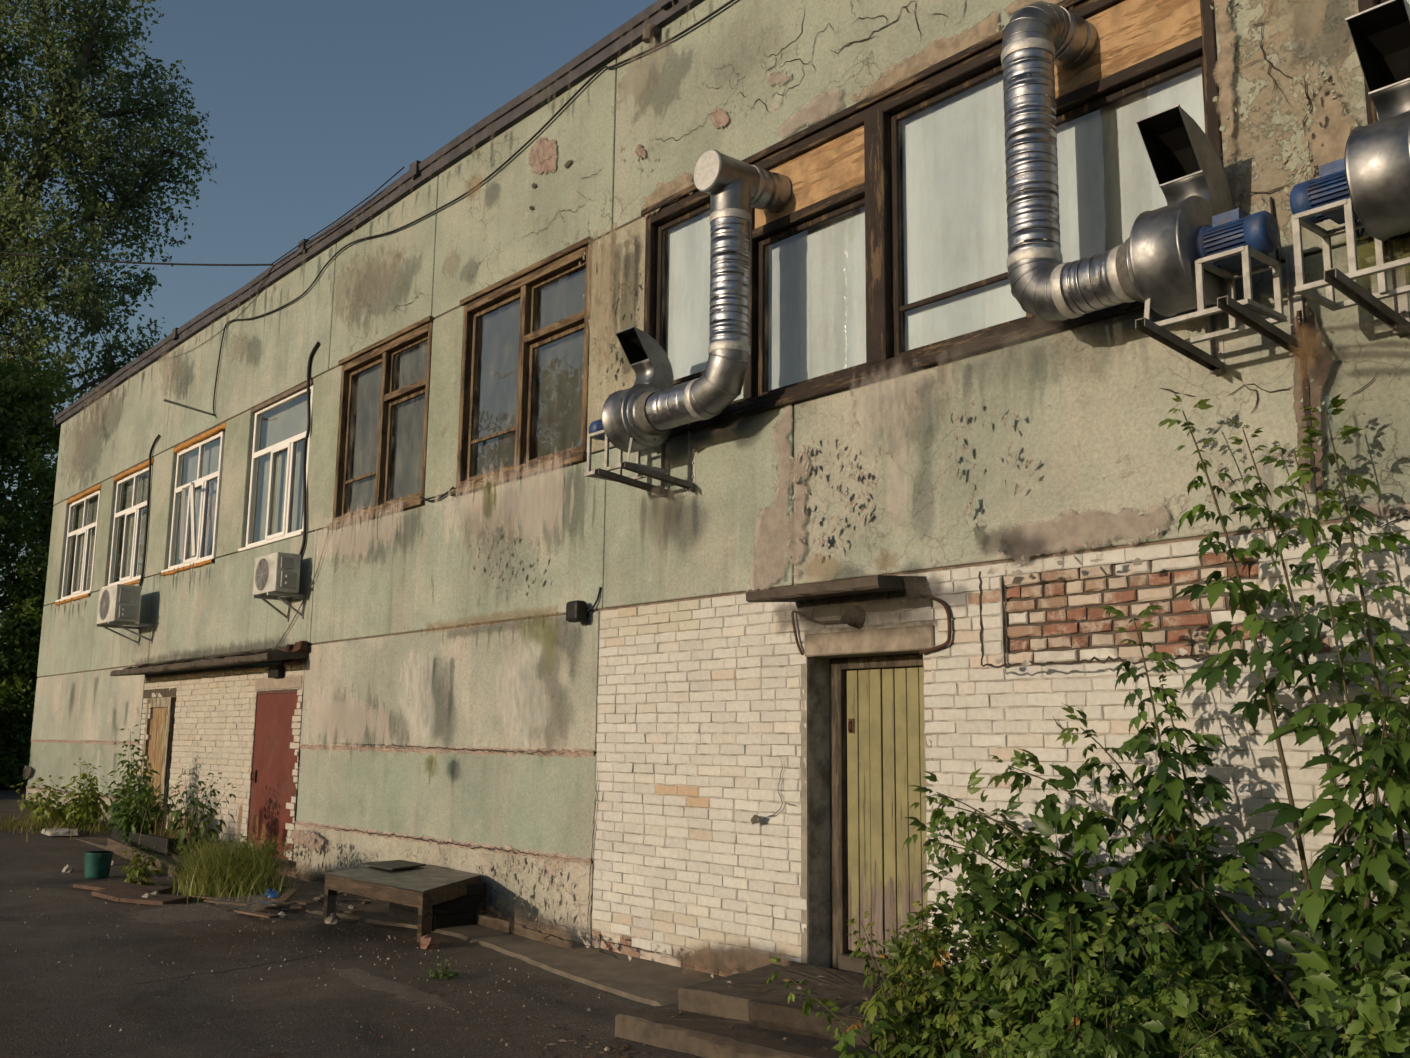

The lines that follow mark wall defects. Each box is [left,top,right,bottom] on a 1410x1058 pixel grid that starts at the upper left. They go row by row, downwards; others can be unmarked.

spalling [528,137,572,188]
crack [651,0,966,142]
peeling [1282,61,1358,199]
leakage [473,482,496,516]
peeling [746,405,869,592]
flaking render [968,503,1263,668]
crack [1364,516,1410,528]
leakage [402,651,437,779]
leakage [501,618,557,745]